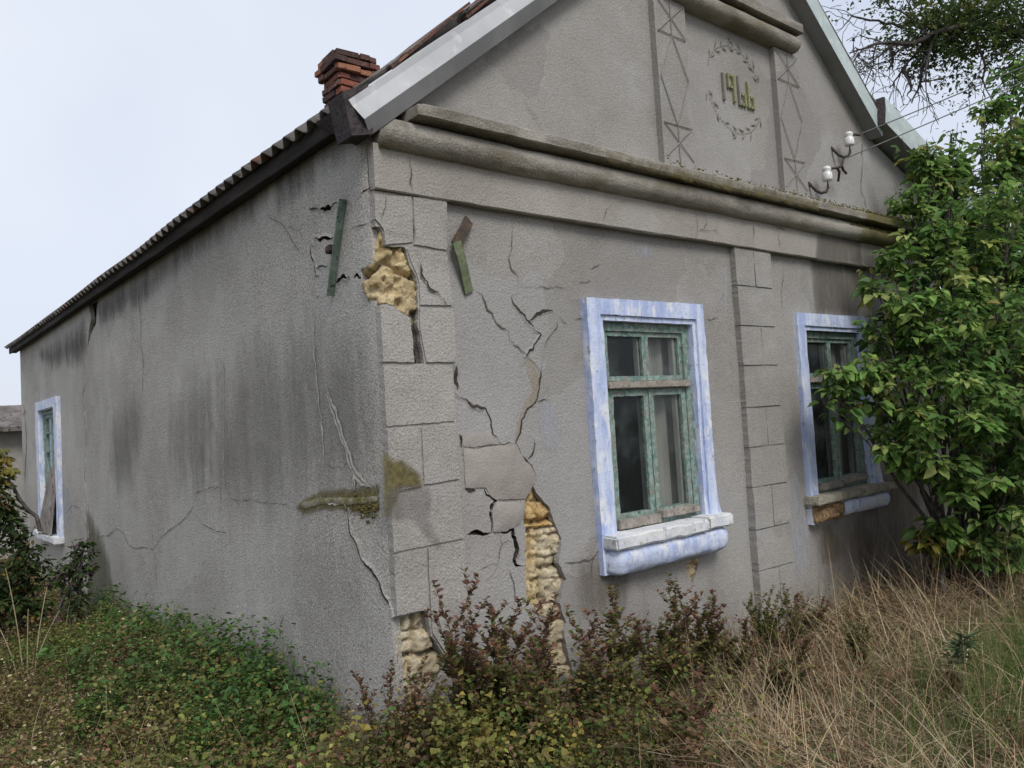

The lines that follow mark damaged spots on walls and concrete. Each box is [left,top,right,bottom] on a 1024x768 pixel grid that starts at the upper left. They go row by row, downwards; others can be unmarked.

spalling [362,231,417,325]
crack [68,344,290,552]
crack [269,161,453,618]
crack [454,230,601,594]
spalling [396,611,440,706]
spalling [519,490,570,676]